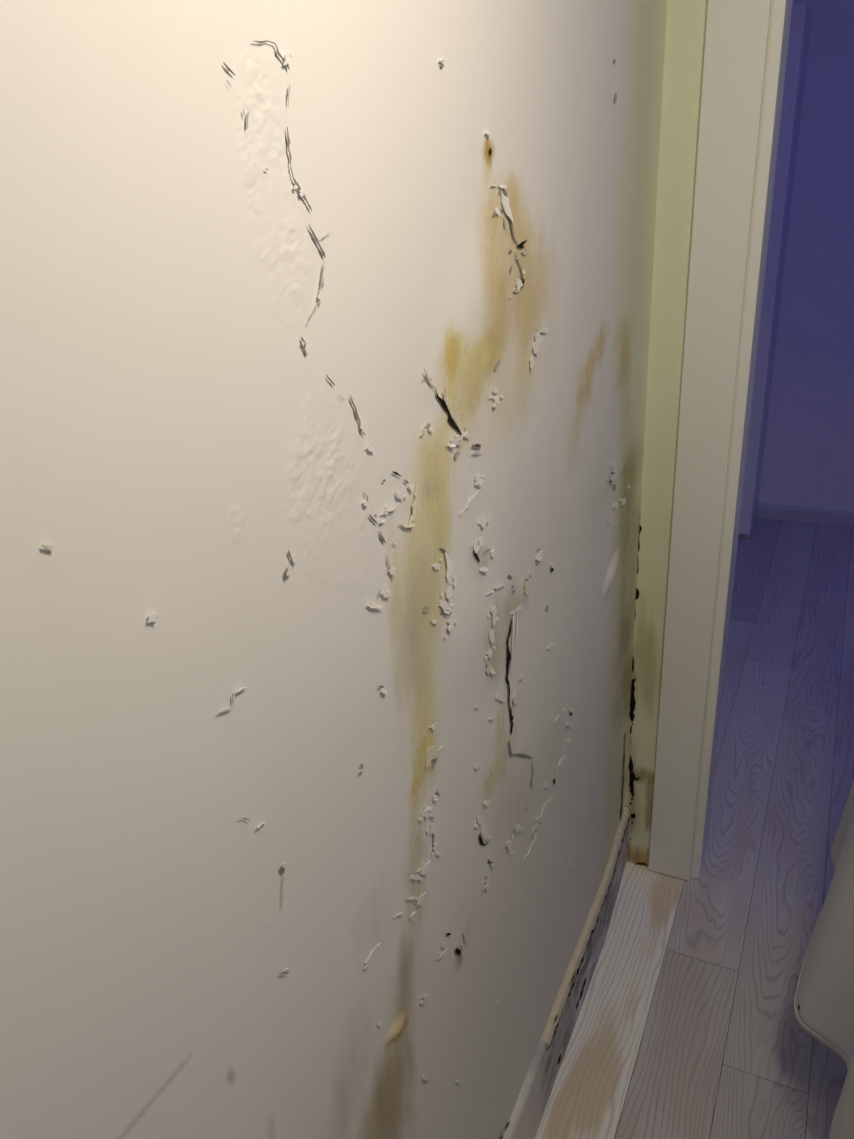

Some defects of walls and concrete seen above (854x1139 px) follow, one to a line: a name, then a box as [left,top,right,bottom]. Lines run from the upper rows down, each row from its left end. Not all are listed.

leakage [447,271,504,408]
leakage [518,219,533,334]
crack [419,369,472,459]
peeling [375,471,418,528]
peeling [423,548,458,639]
spalling [471,513,495,573]
leakage [625,469,642,615]
peeling [394,789,443,920]
crack [485,571,534,812]
peeling [475,707,575,891]
crack [619,733,627,818]
leakage [625,657,654,827]